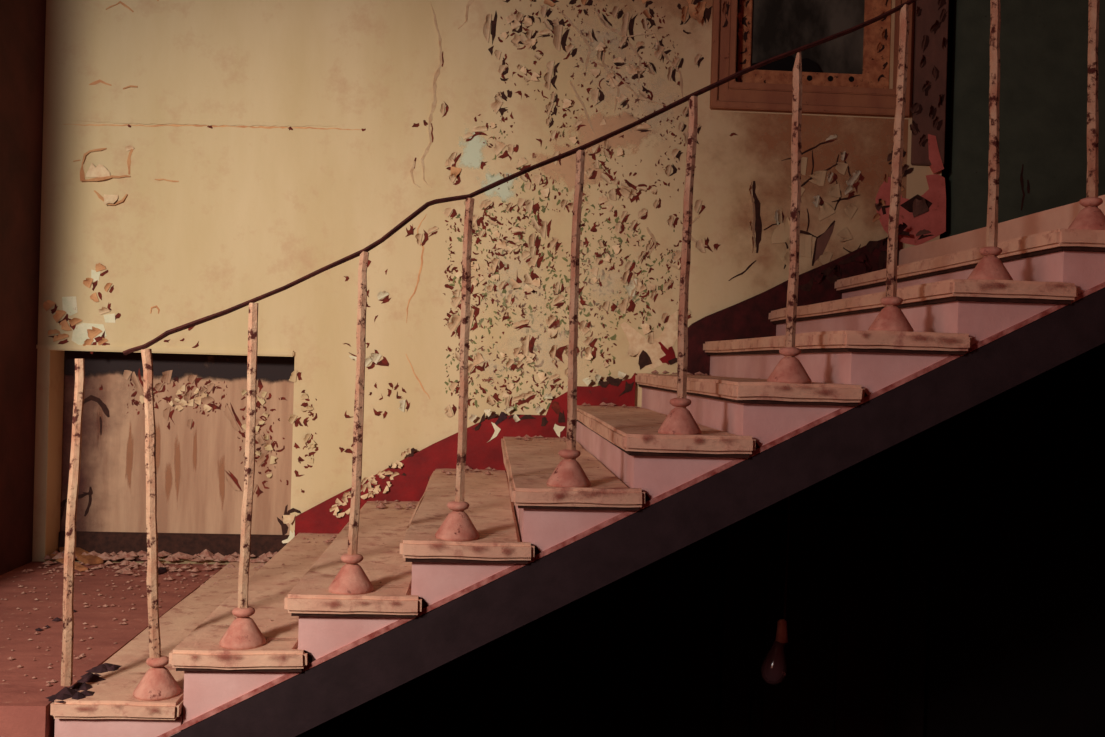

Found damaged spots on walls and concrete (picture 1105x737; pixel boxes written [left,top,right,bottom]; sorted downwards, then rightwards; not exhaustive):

peeling [677,0,750,64]
crack [63,119,366,131]
crack [410,0,474,188]
flaking render [771,0,948,291]
flaking render [406,0,720,442]
peeling [43,263,121,354]
peeling [367,290,391,322]
crack [406,215,428,323]
peeling [123,368,318,498]
peeling [344,343,389,369]
peeling [369,383,410,419]